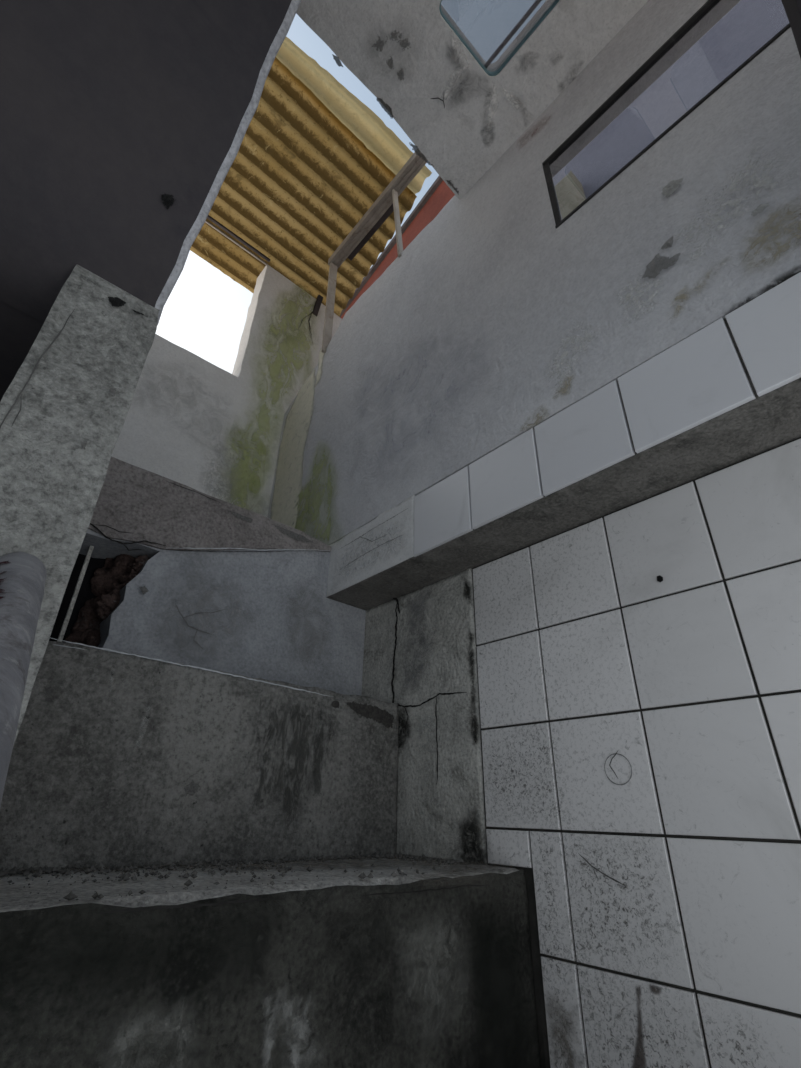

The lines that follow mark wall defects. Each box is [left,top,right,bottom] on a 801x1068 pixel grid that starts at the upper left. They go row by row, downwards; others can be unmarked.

spalling [49,545,150,650]
damp [255,706,327,816]
damp [574,845,663,957]
damp [587,982,691,1068]